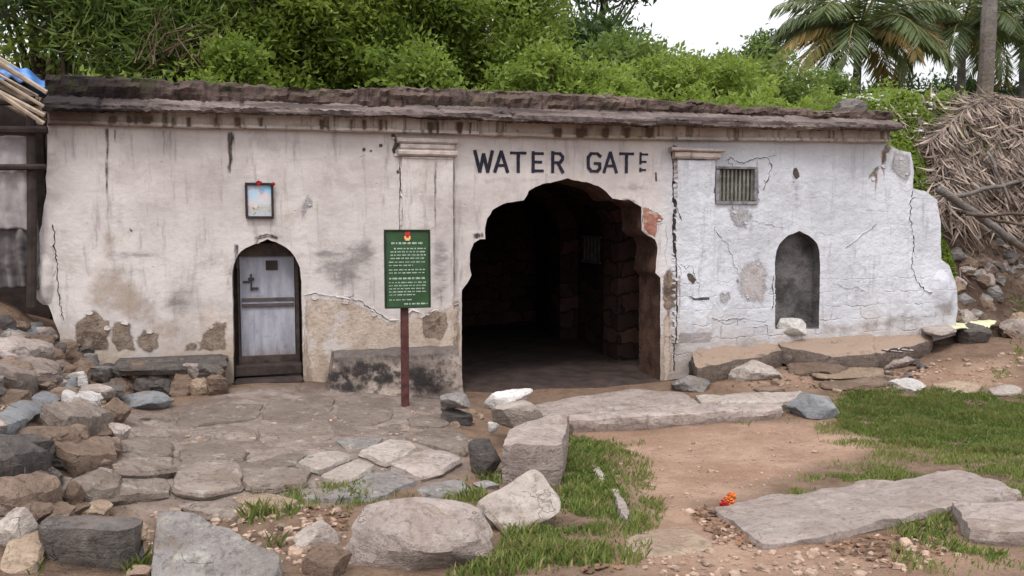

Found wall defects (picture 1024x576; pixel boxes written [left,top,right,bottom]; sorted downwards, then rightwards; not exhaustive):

leakage [227,118,241,171]
peeling [869,145,911,181]
crack [50,224,66,320]
spalling [625,199,663,238]
crack [663,144,683,371]
crack [714,154,783,274]
crack [907,189,932,296]
peeling [75,310,158,352]
peeling [186,323,226,351]
peeling [302,296,461,383]
mould [326,361,442,393]
peeling [662,260,767,381]